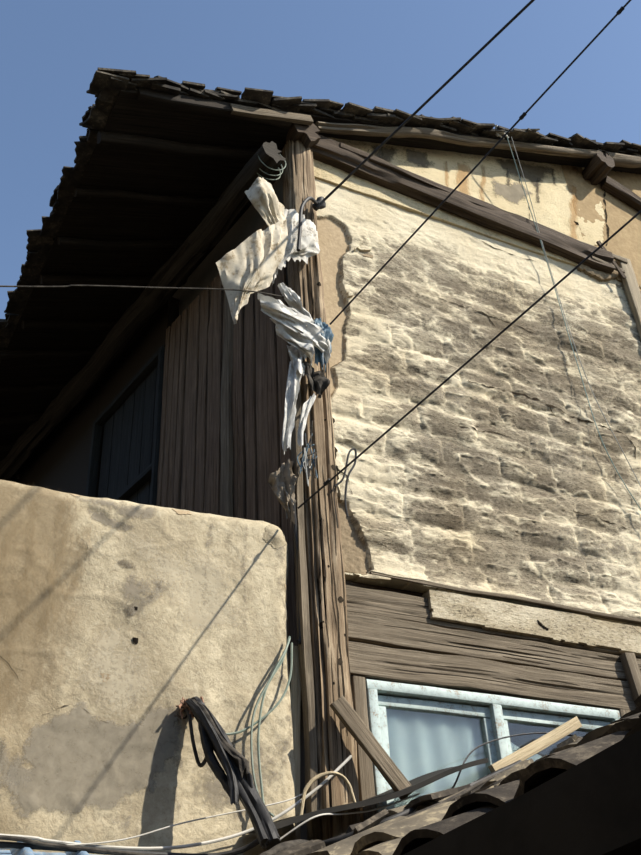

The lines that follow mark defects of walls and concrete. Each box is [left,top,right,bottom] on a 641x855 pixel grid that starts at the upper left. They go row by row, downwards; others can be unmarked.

leakage [493,159,555,204]
peeling [317,217,373,397]
crack [431,295,541,335]
crack [428,415,529,446]
crack [468,380,636,459]
crack [334,446,352,498]
spalling [337,497,372,575]
leakage [0,632,183,817]